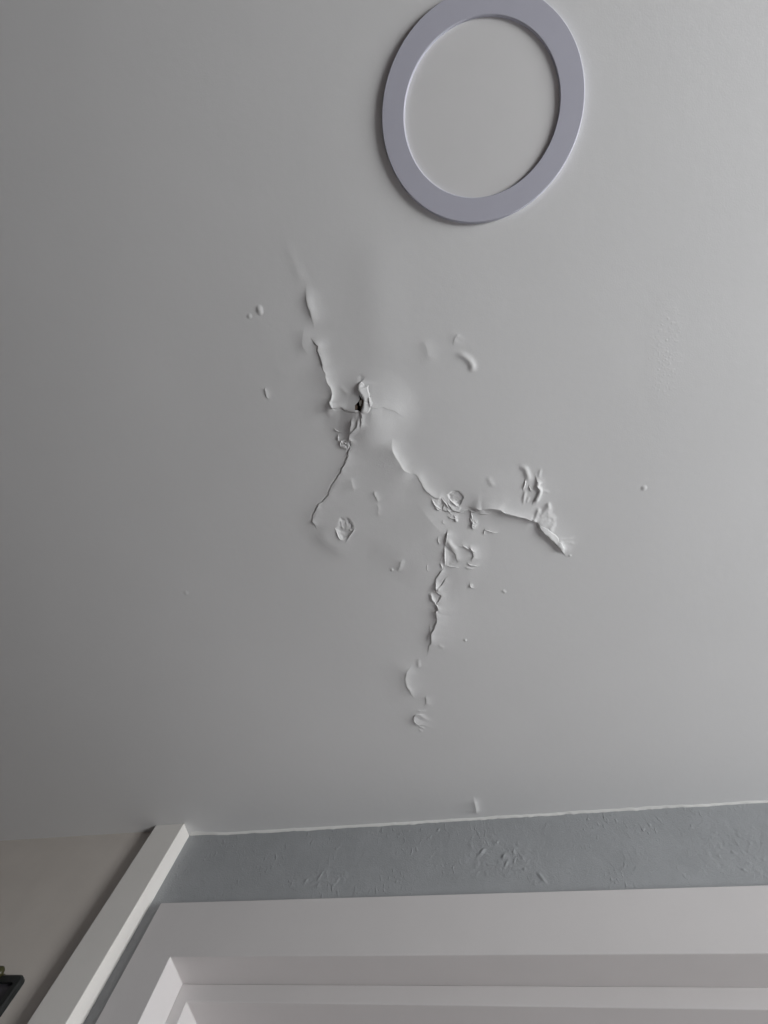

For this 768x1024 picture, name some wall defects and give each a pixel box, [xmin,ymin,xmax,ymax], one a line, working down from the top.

crack [307,332,536,559]
spalling [333,516,358,544]
peeling [424,489,500,572]
peeling [532,499,577,558]